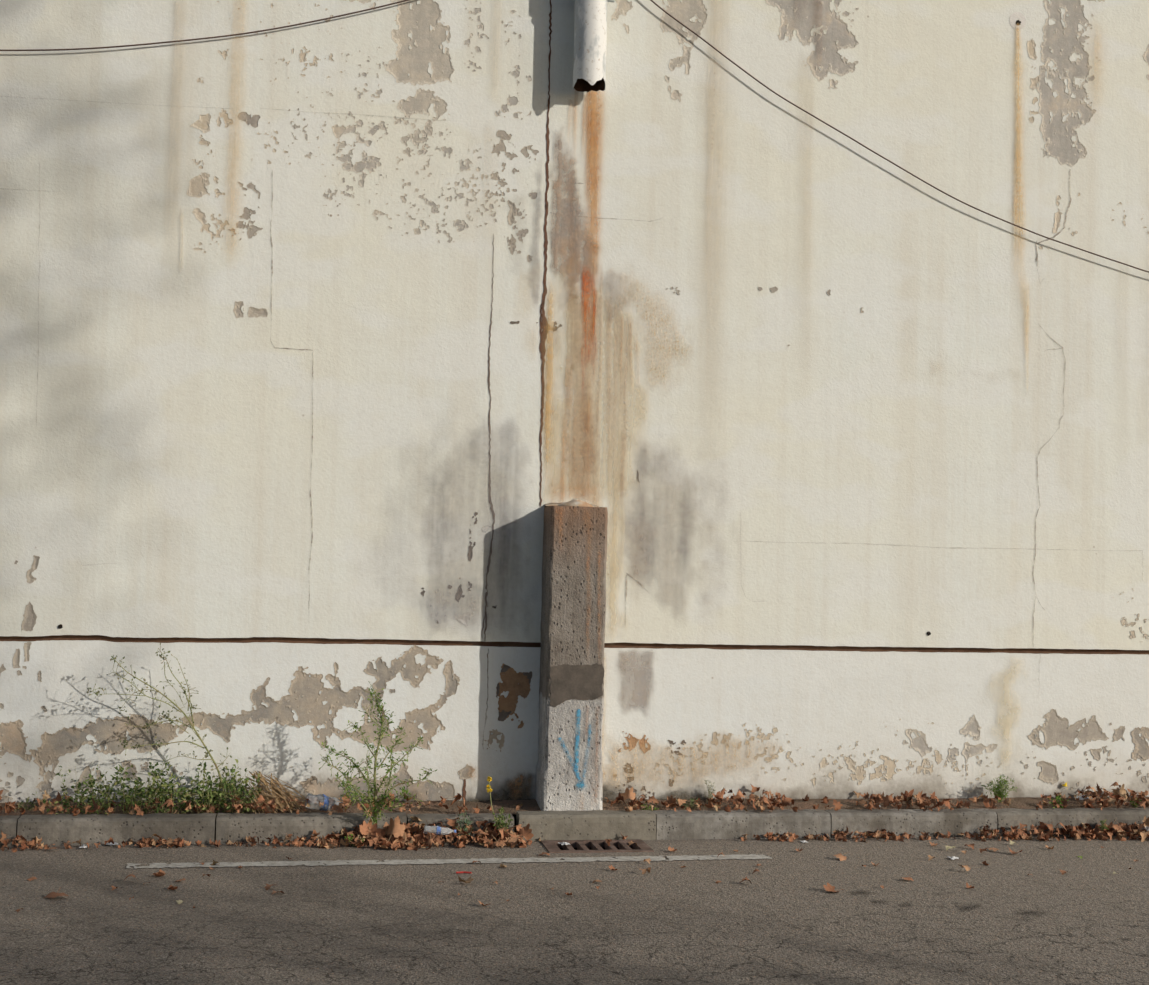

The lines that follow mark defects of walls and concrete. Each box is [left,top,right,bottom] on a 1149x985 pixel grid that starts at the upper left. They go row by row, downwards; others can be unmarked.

peeling [186,0,539,262]
rust [589,91,599,260]
peeling [611,0,633,34]
peeling [660,0,708,102]
peeling [765,0,859,89]
peeling [1027,0,1105,167]
rust [582,272,595,352]
crack [482,234,495,719]
peeling [0,602,42,682]
peeling [0,645,475,803]
spalling [484,663,532,752]
peeling [1021,709,1149,790]